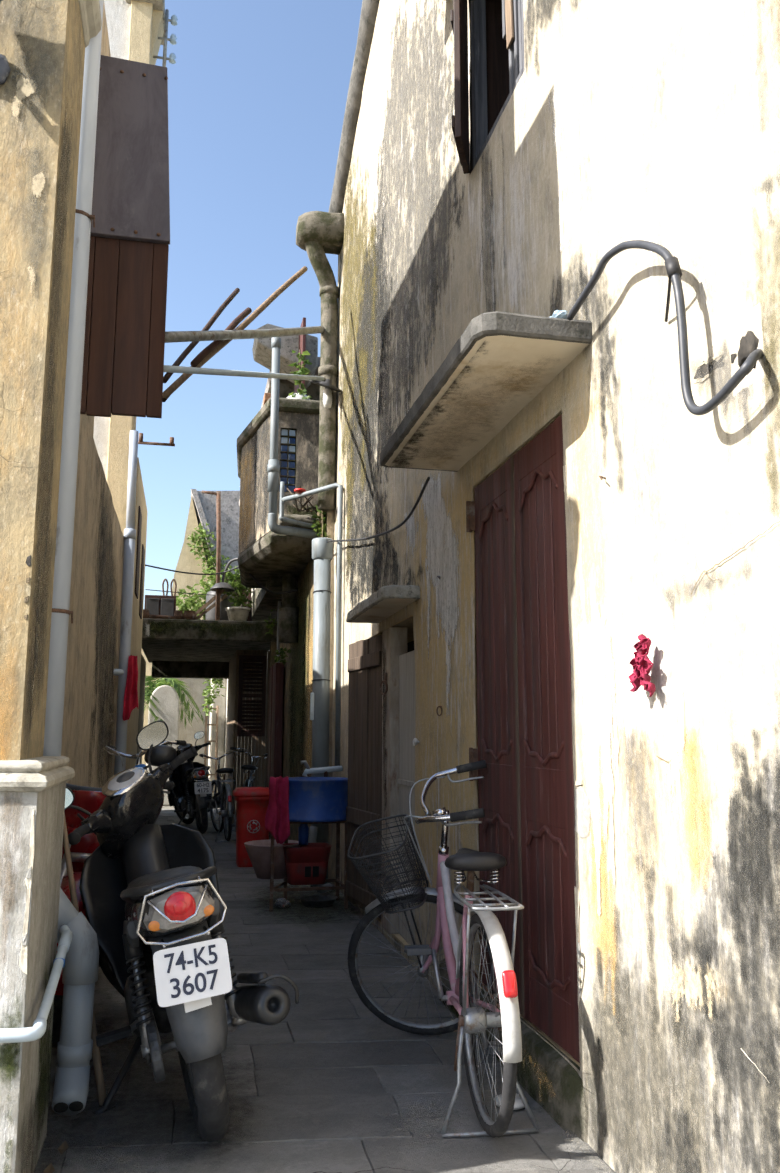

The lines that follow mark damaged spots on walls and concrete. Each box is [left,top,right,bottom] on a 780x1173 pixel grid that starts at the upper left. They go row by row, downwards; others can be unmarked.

flaking render [12,78,36,116]
flaking render [32,172,45,197]
water stain [343,0,485,608]
water stain [583,730,780,1173]
water stain [4,1074,49,1173]